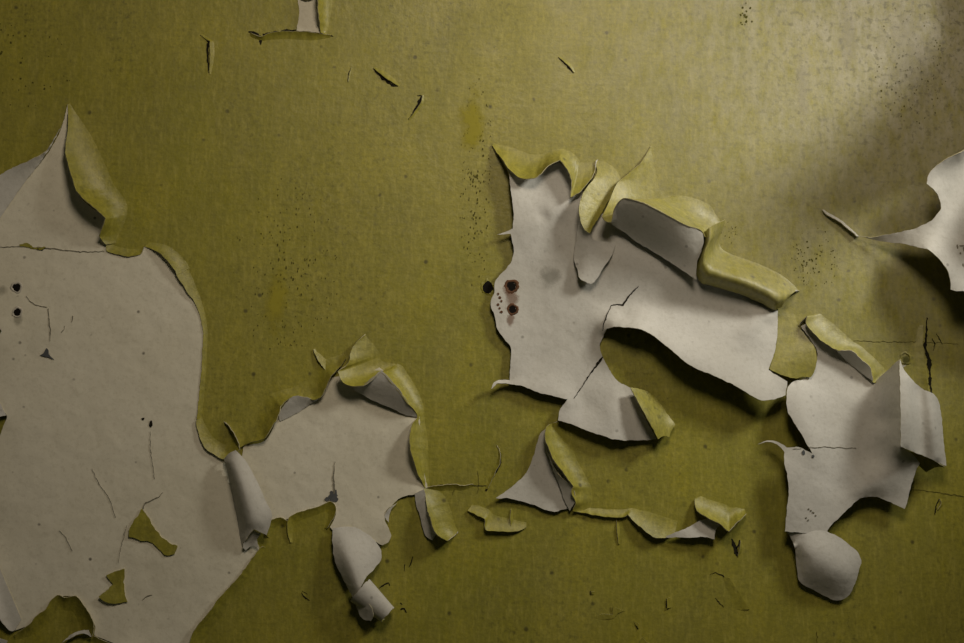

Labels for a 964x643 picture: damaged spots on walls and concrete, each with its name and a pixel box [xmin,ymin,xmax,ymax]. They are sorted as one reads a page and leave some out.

peeling [248,0,333,45]
peeling [0,104,473,643]
peeling [468,143,964,601]
crack [857,317,952,393]